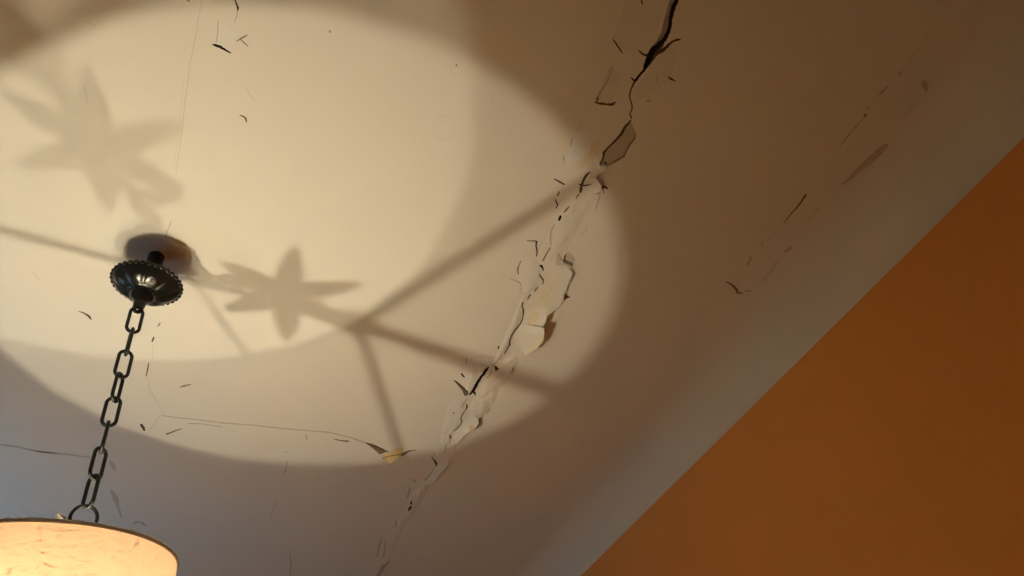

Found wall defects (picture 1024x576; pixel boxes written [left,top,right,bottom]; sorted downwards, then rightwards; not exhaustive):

crack [140,0,681,576]
peeling [514,257,572,356]
peeling [447,411,479,445]
crack [0,444,90,458]
peeling [368,444,403,464]